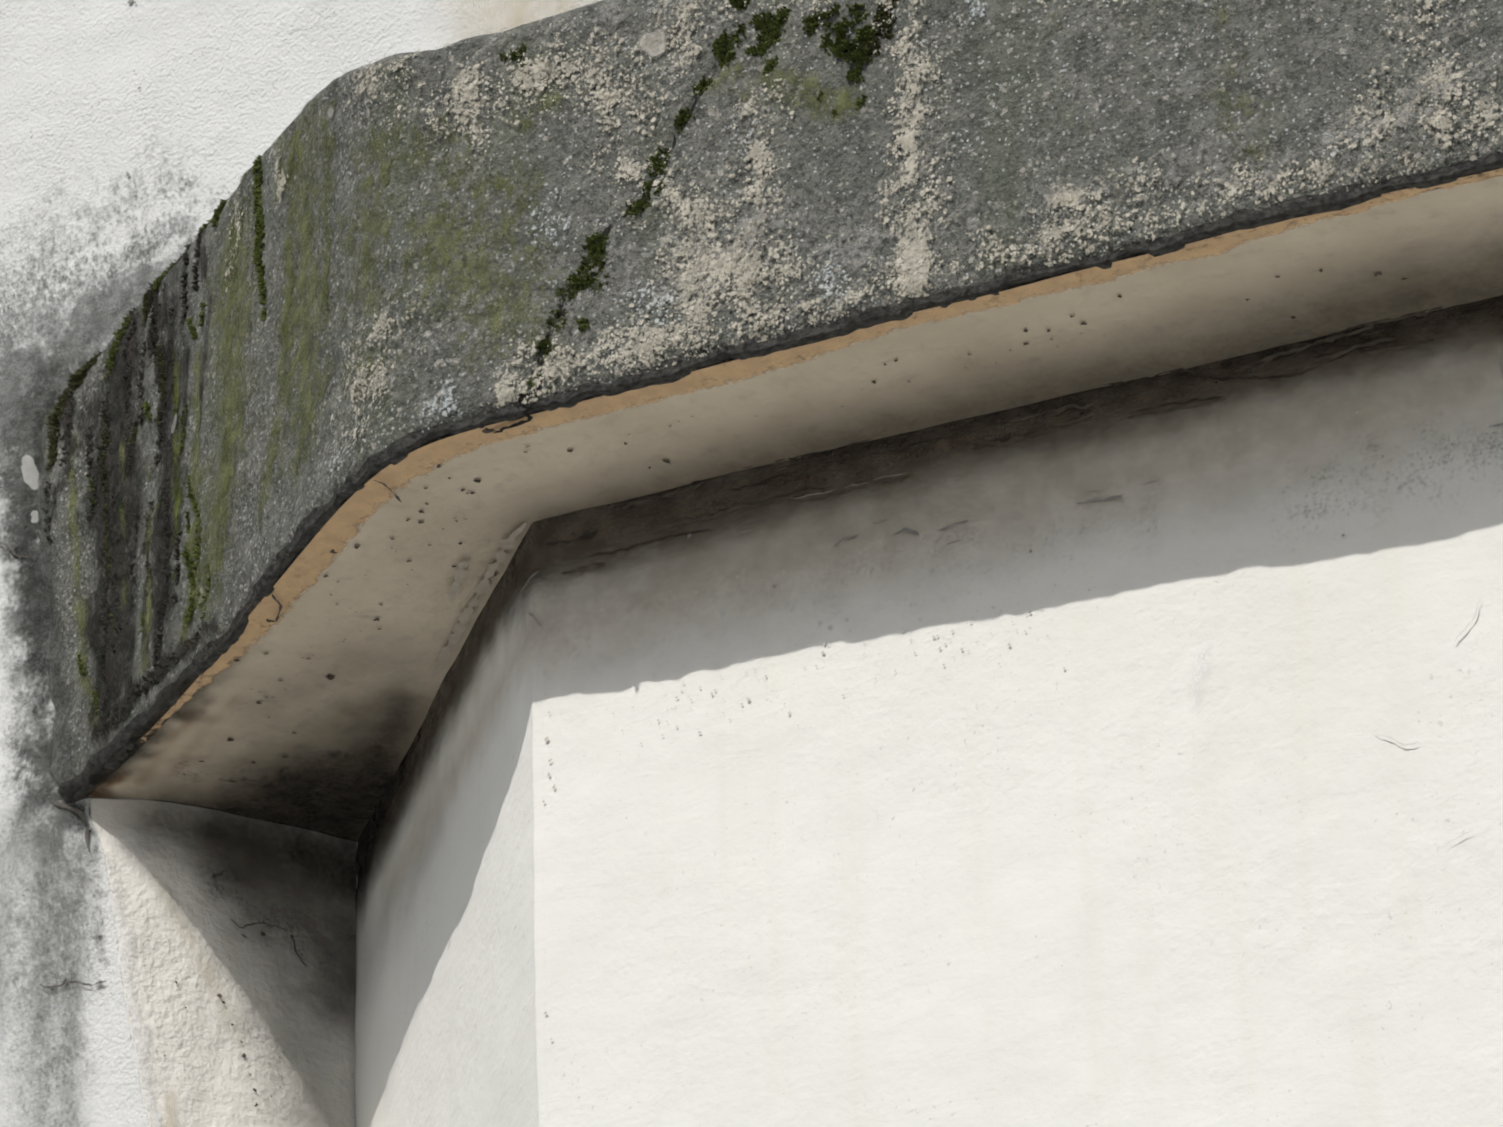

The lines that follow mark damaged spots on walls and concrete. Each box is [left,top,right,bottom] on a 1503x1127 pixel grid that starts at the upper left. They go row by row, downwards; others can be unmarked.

damp [407,0,1503,408]
damp [331,289,417,432]
damp [37,230,216,786]
damp [9,829,103,1054]
damp [192,704,413,989]